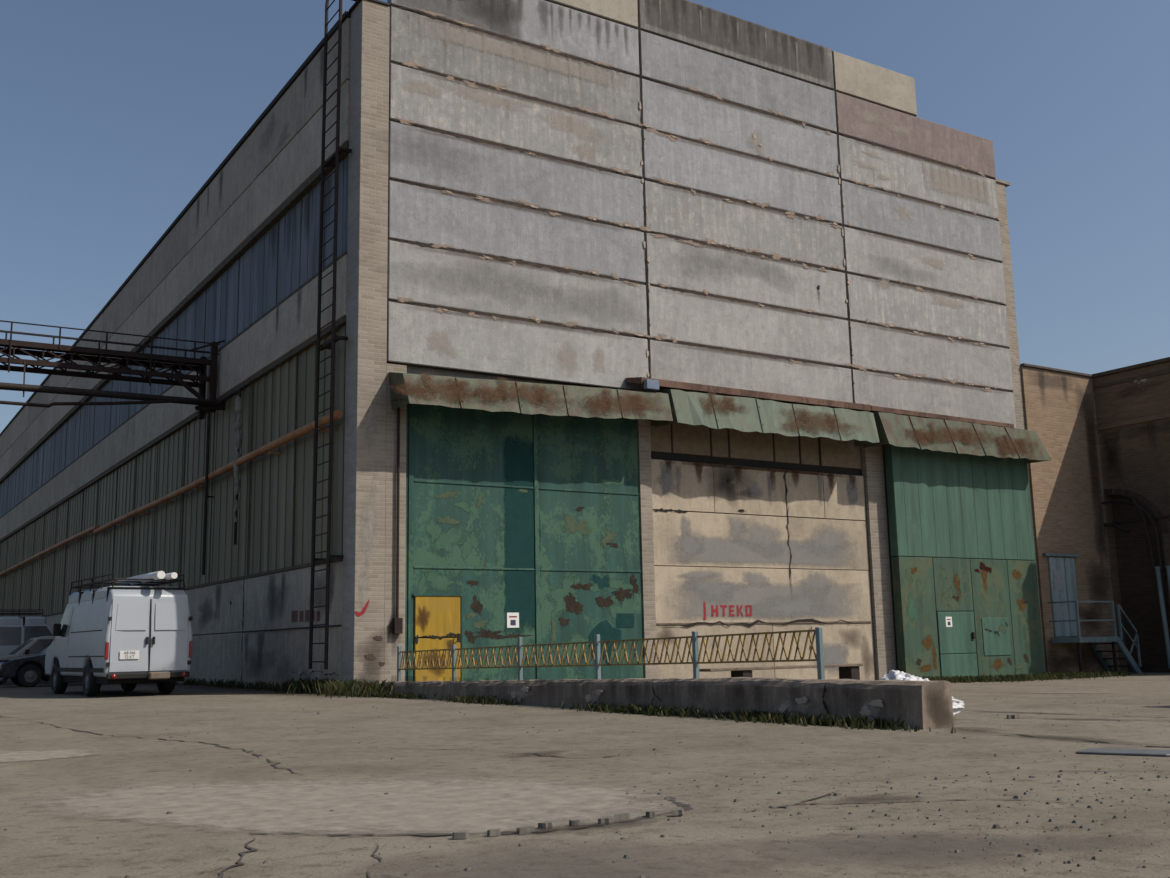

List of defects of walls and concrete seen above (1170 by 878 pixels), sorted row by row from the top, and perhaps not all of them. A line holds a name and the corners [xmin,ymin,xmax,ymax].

damp [437,26,603,84]
corrosion [398,373,566,407]
corrosion [784,409,851,434]
crack [783,465,792,585]
corrosion [975,562,992,588]
crack [657,619,868,637]
corrosion [916,636,937,672]